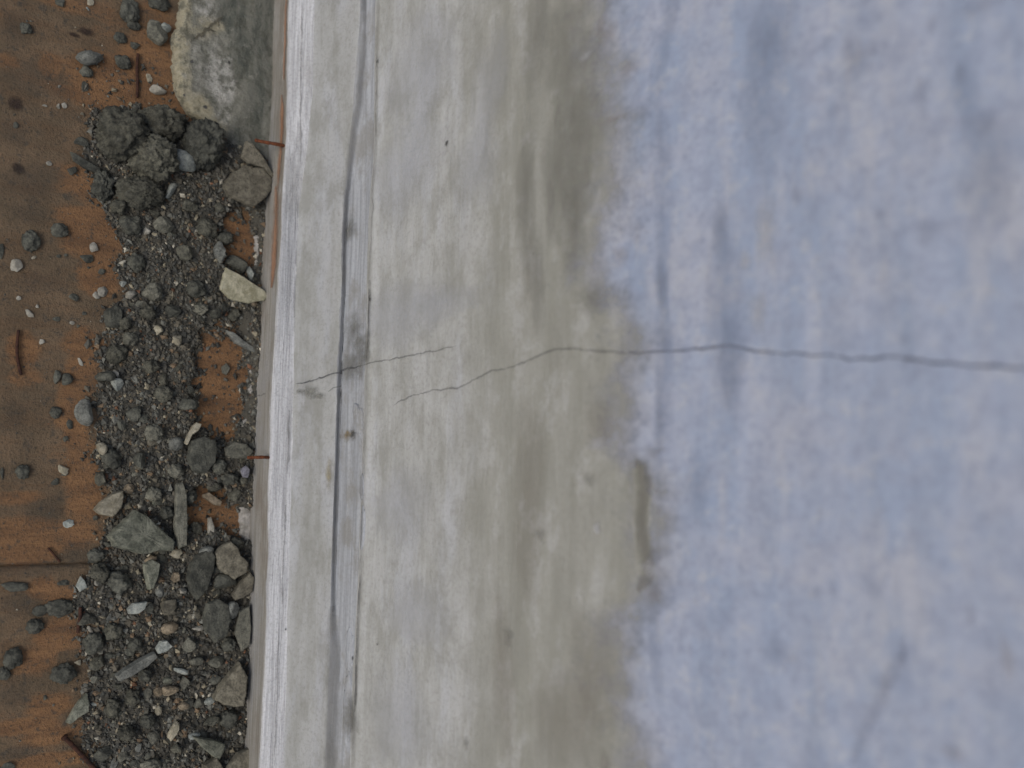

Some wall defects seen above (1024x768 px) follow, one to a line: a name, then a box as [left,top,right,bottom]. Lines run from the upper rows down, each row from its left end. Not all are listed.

crack [296,292,369,384]
crack [628,345,1024,369]